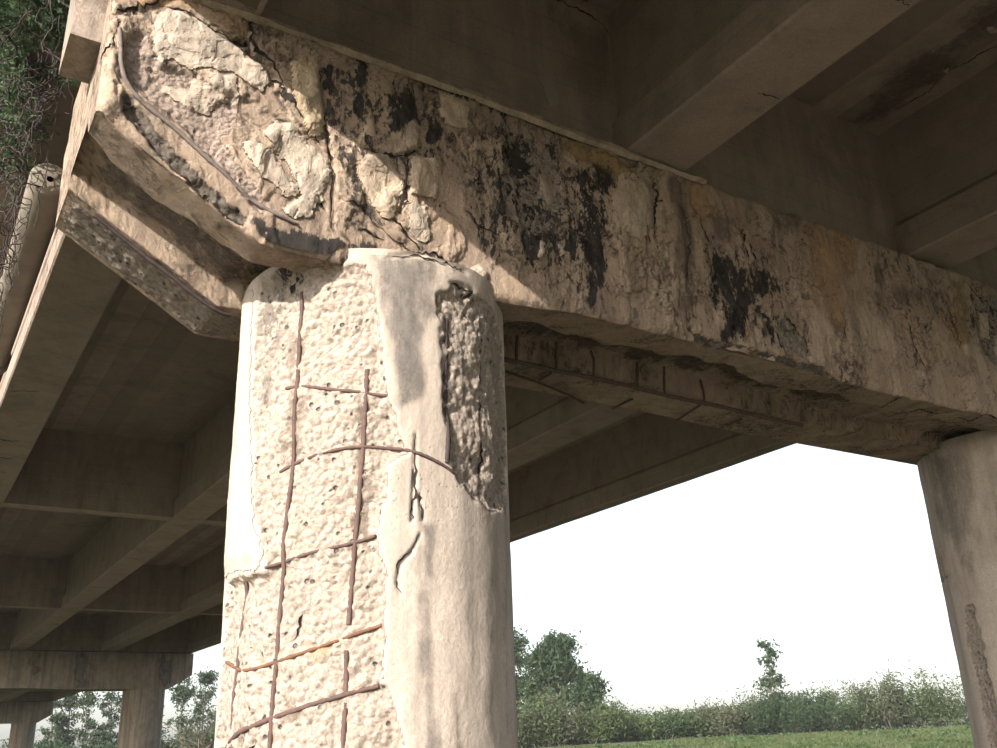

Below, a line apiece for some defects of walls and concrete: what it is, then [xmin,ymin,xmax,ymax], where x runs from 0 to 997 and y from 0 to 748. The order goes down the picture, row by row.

spalling [117,8,330,225]
crack [100,0,473,300]
leakage [276,268,304,300]
leakage [251,59,453,255]
leakage [378,259,433,402]
leakage [450,92,615,310]
leakage [503,321,778,389]
leakage [668,178,794,349]
spalling [687,318,830,376]
crack [396,434,423,592]
spalling [64,198,803,748]